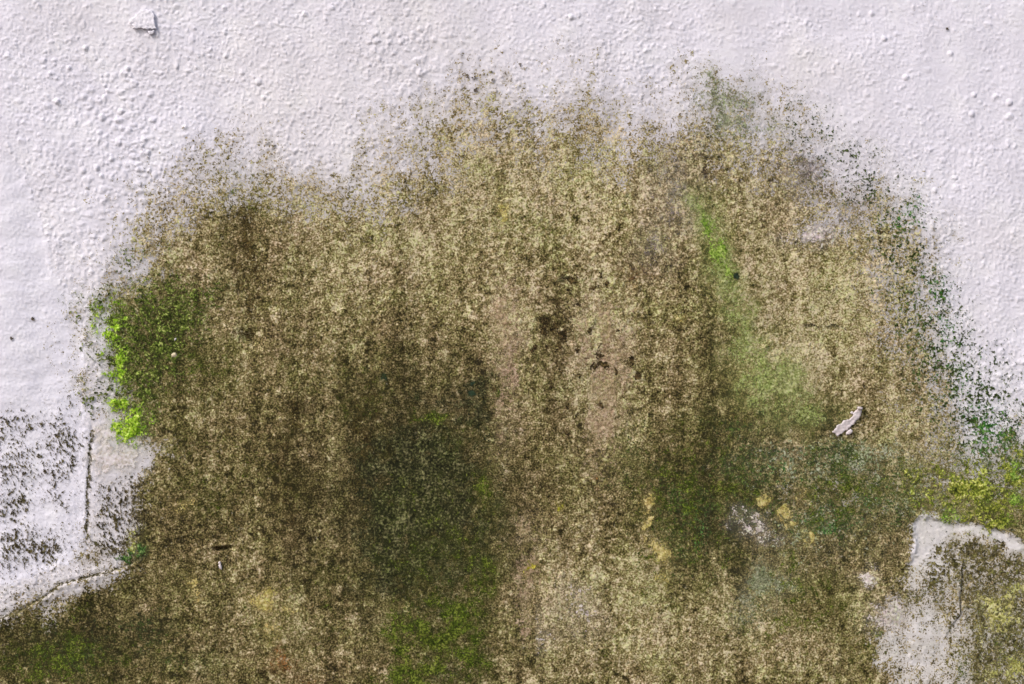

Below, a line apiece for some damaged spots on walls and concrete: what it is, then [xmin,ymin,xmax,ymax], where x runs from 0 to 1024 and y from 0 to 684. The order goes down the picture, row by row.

mould [626,47,696,100]
mould [61,306,101,349]
mould [59,348,98,410]
mould [0,401,86,580]